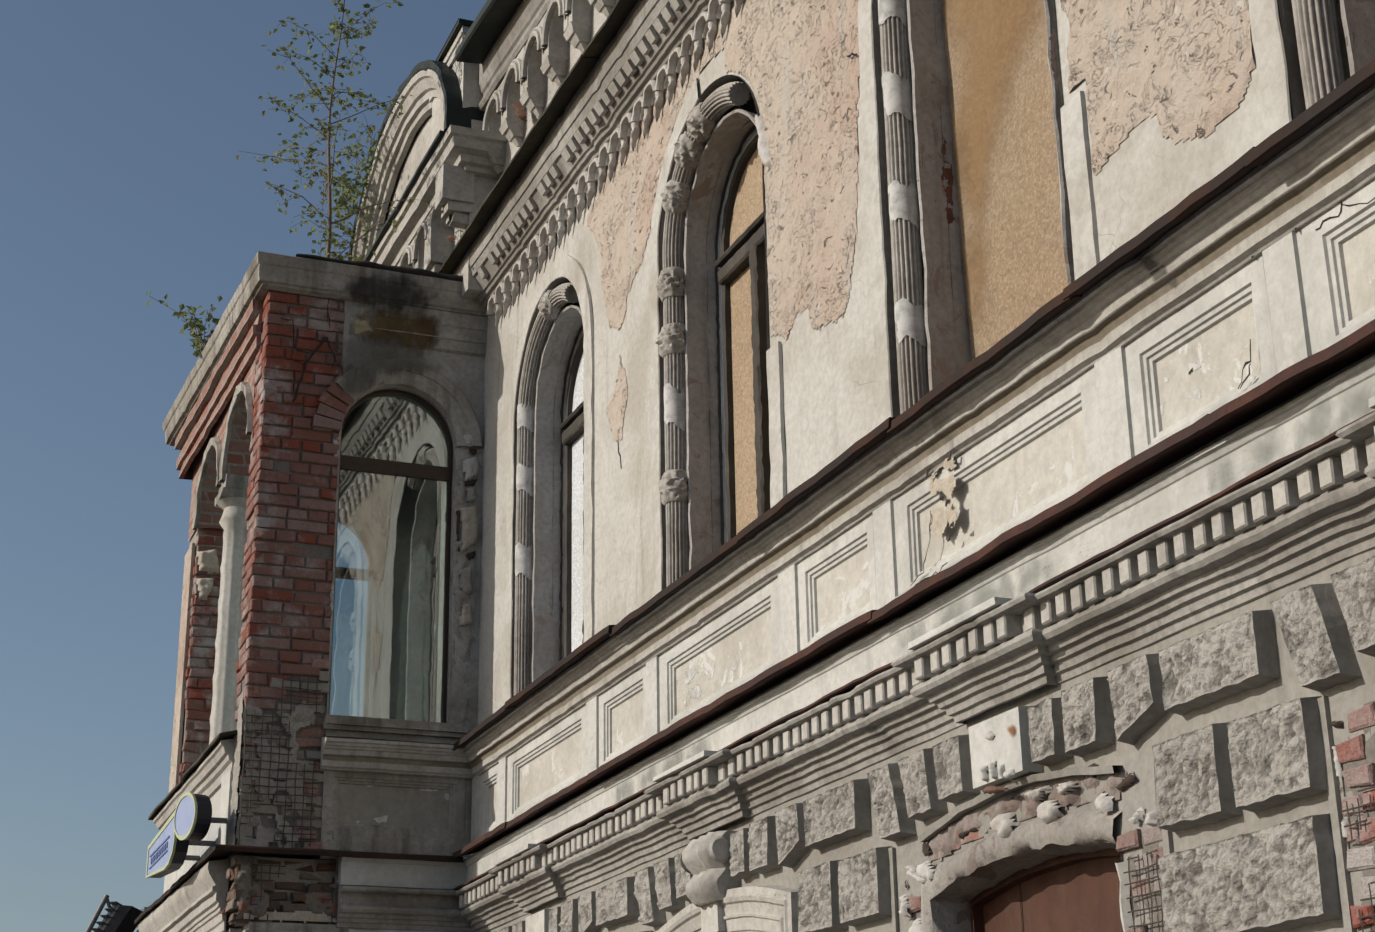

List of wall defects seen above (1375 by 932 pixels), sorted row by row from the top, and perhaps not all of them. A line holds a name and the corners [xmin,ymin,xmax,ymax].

flaking render [1049,0,1256,176]
flaking render [586,0,860,341]
crack [1294,198,1375,232]
damp [336,274,437,394]
flaking render [606,356,627,442]
crack [1238,339,1251,389]
flaking render [926,452,957,539]
spalling [218,696,338,929]